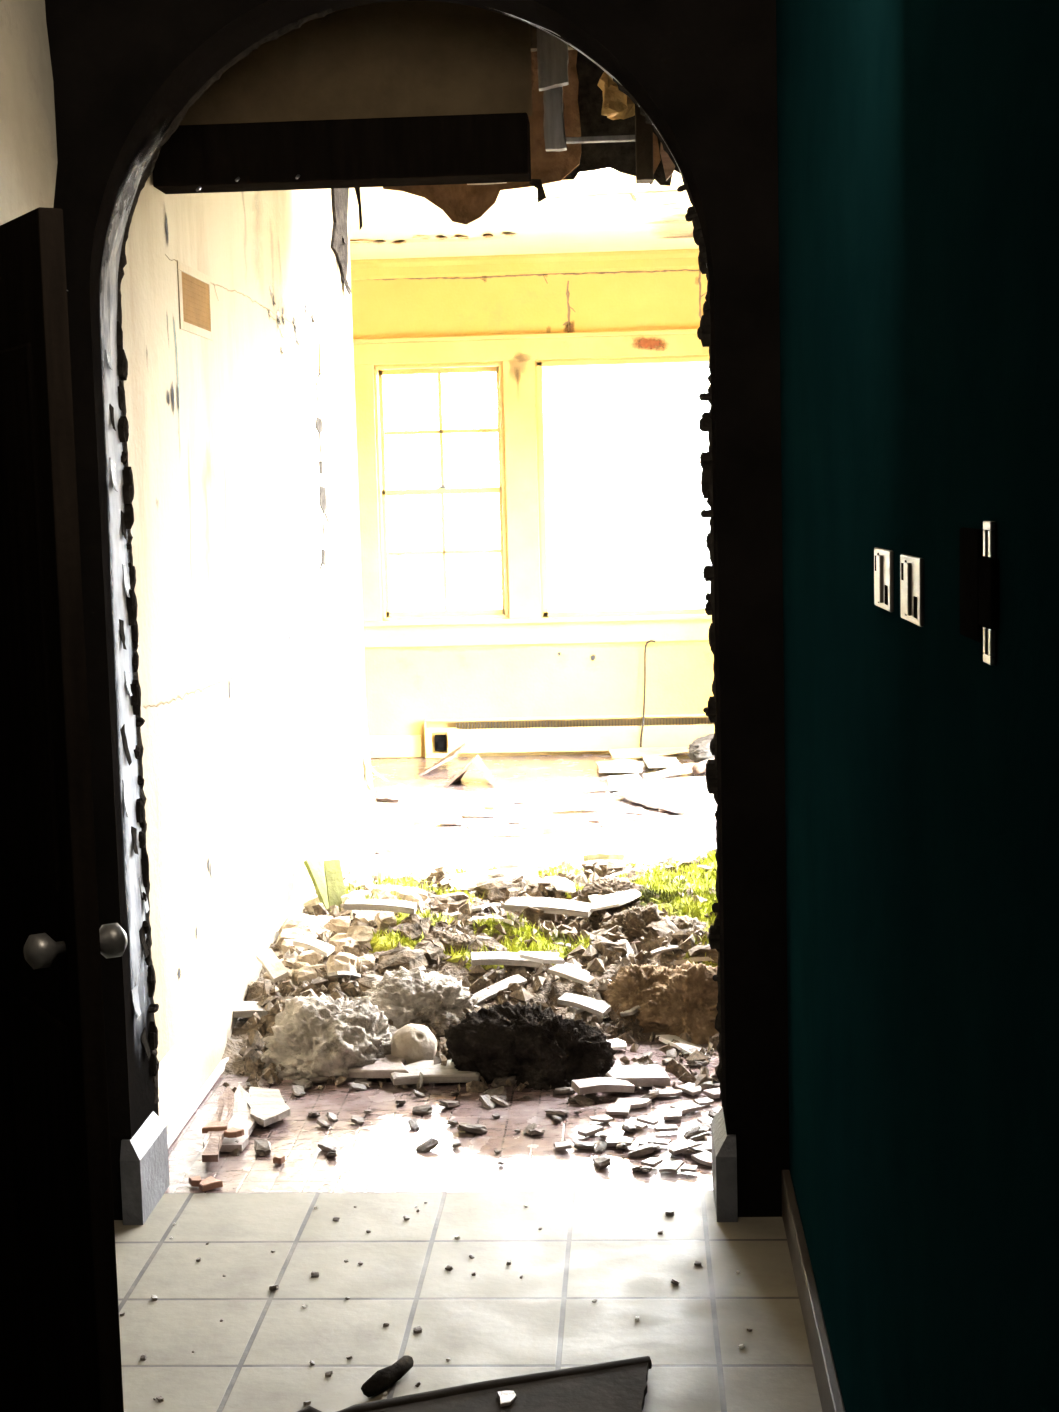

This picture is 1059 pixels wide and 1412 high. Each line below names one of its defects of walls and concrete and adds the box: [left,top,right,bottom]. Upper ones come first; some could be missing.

crack [143,282,363,709]